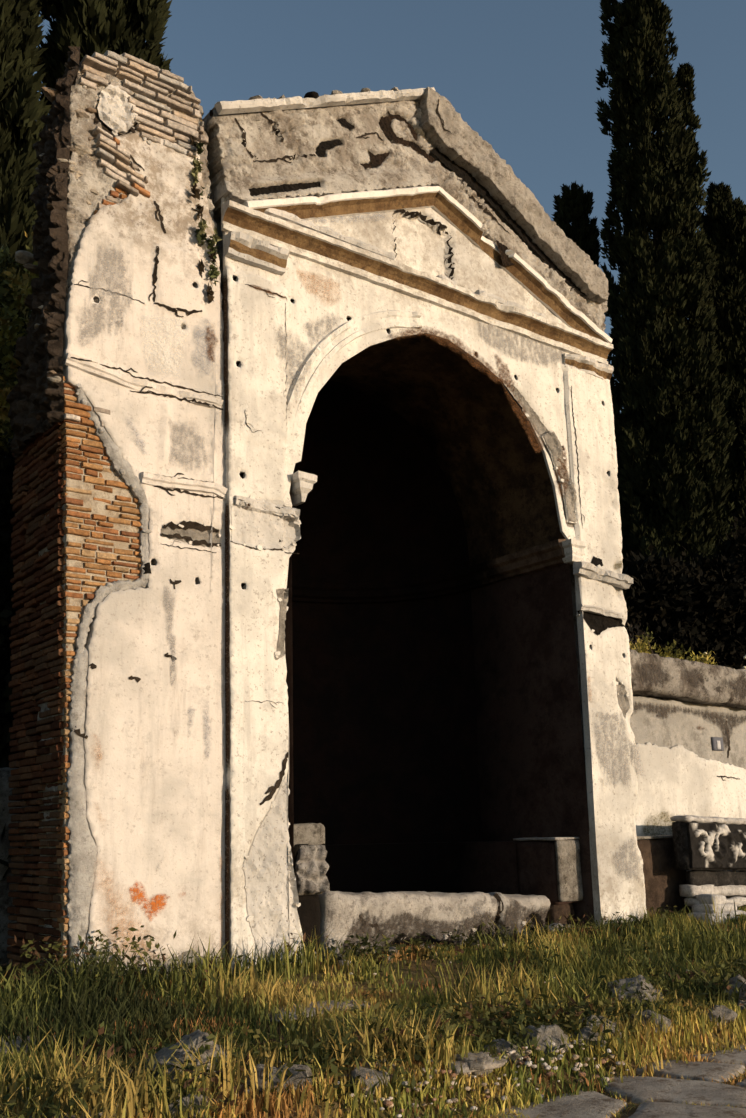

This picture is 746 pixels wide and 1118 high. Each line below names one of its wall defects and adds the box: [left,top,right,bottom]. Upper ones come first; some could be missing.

spalling [78,50,208,215]
spalling [55,376,301,972]
crack [259,752,289,805]
corrosion [130,883,166,919]
spalling [165,950,203,979]